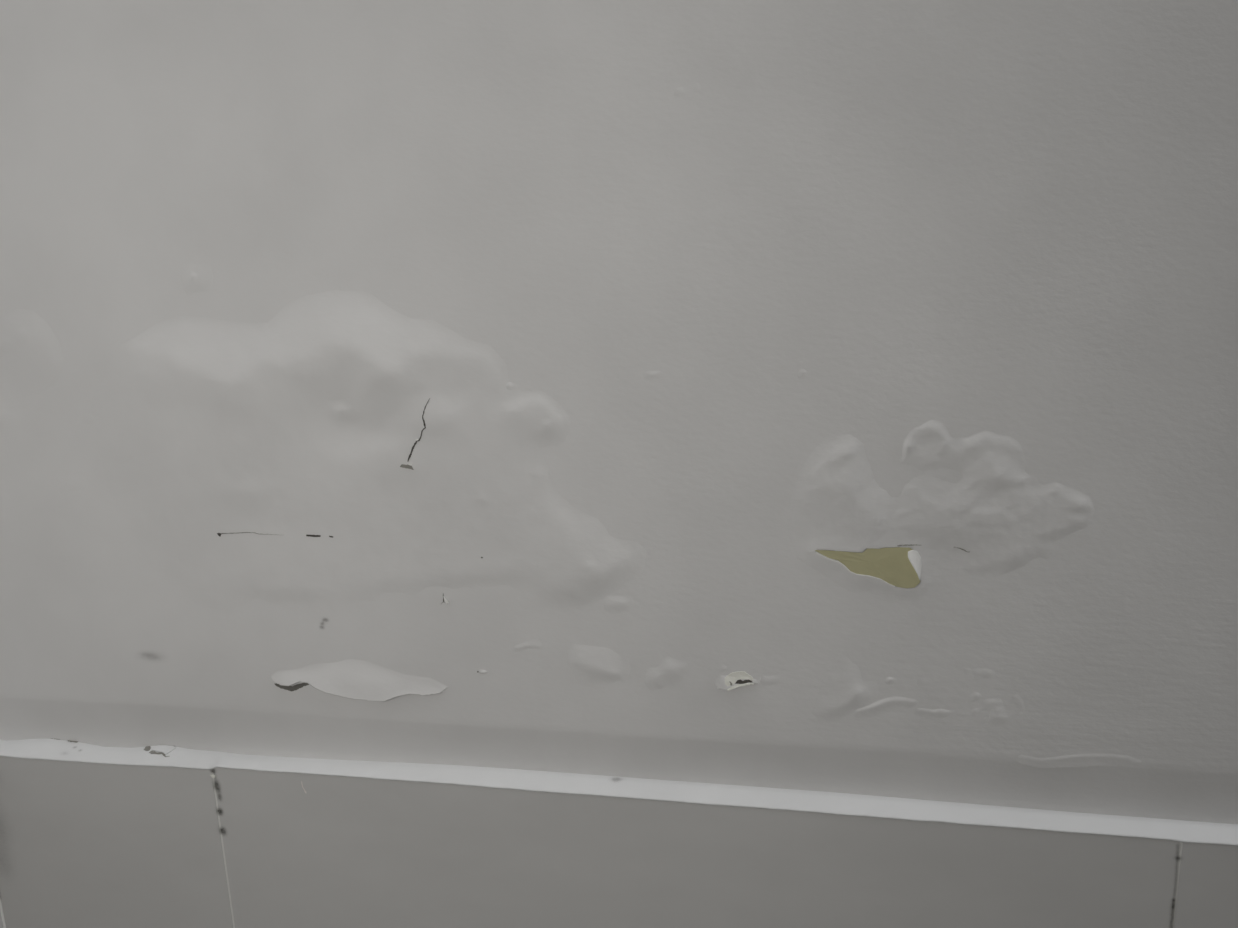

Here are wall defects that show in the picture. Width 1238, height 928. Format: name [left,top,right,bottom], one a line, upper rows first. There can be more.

crack [400,400,429,470]
peeling [815,544,922,588]
spalling [714,663,786,691]